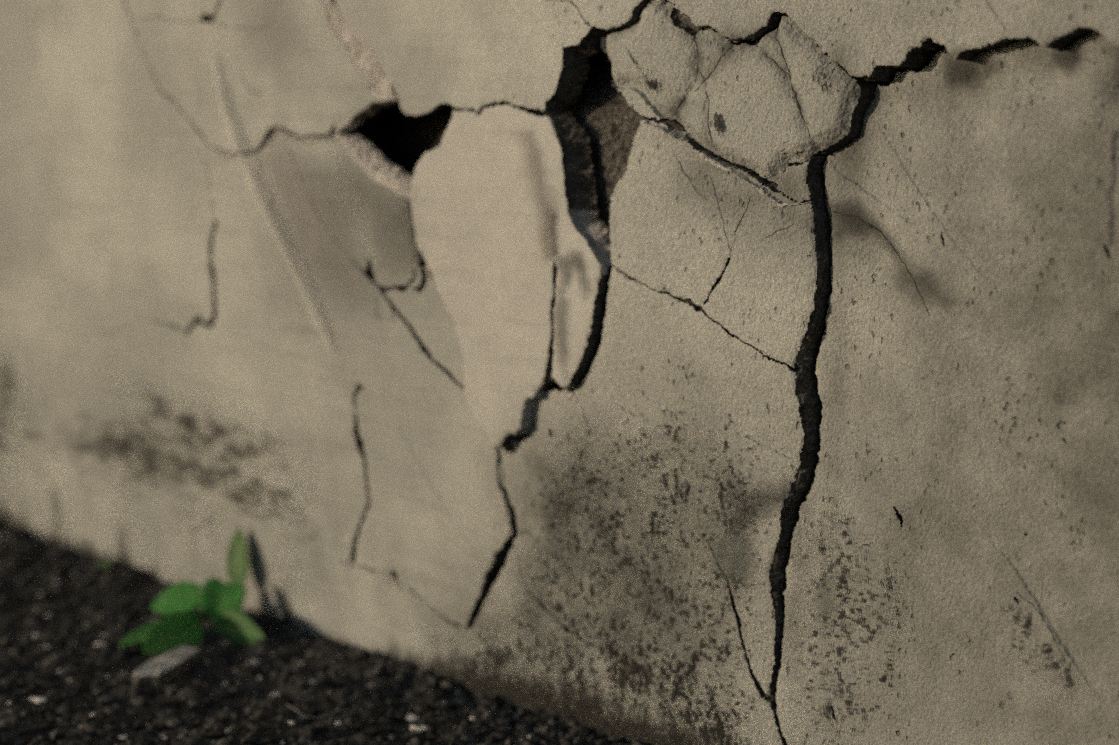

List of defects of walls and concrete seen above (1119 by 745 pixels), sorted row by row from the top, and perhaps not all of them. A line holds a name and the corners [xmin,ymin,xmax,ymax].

crack [100,0,343,335]
crack [320,0,399,101]
crack [356,251,464,390]
flaking render [335,26,645,447]
crack [455,101,554,117]
crack [537,0,1094,745]
crack [339,384,621,654]
leakage [385,395,779,745]
leakage [797,512,900,745]
leakage [992,602,1076,689]